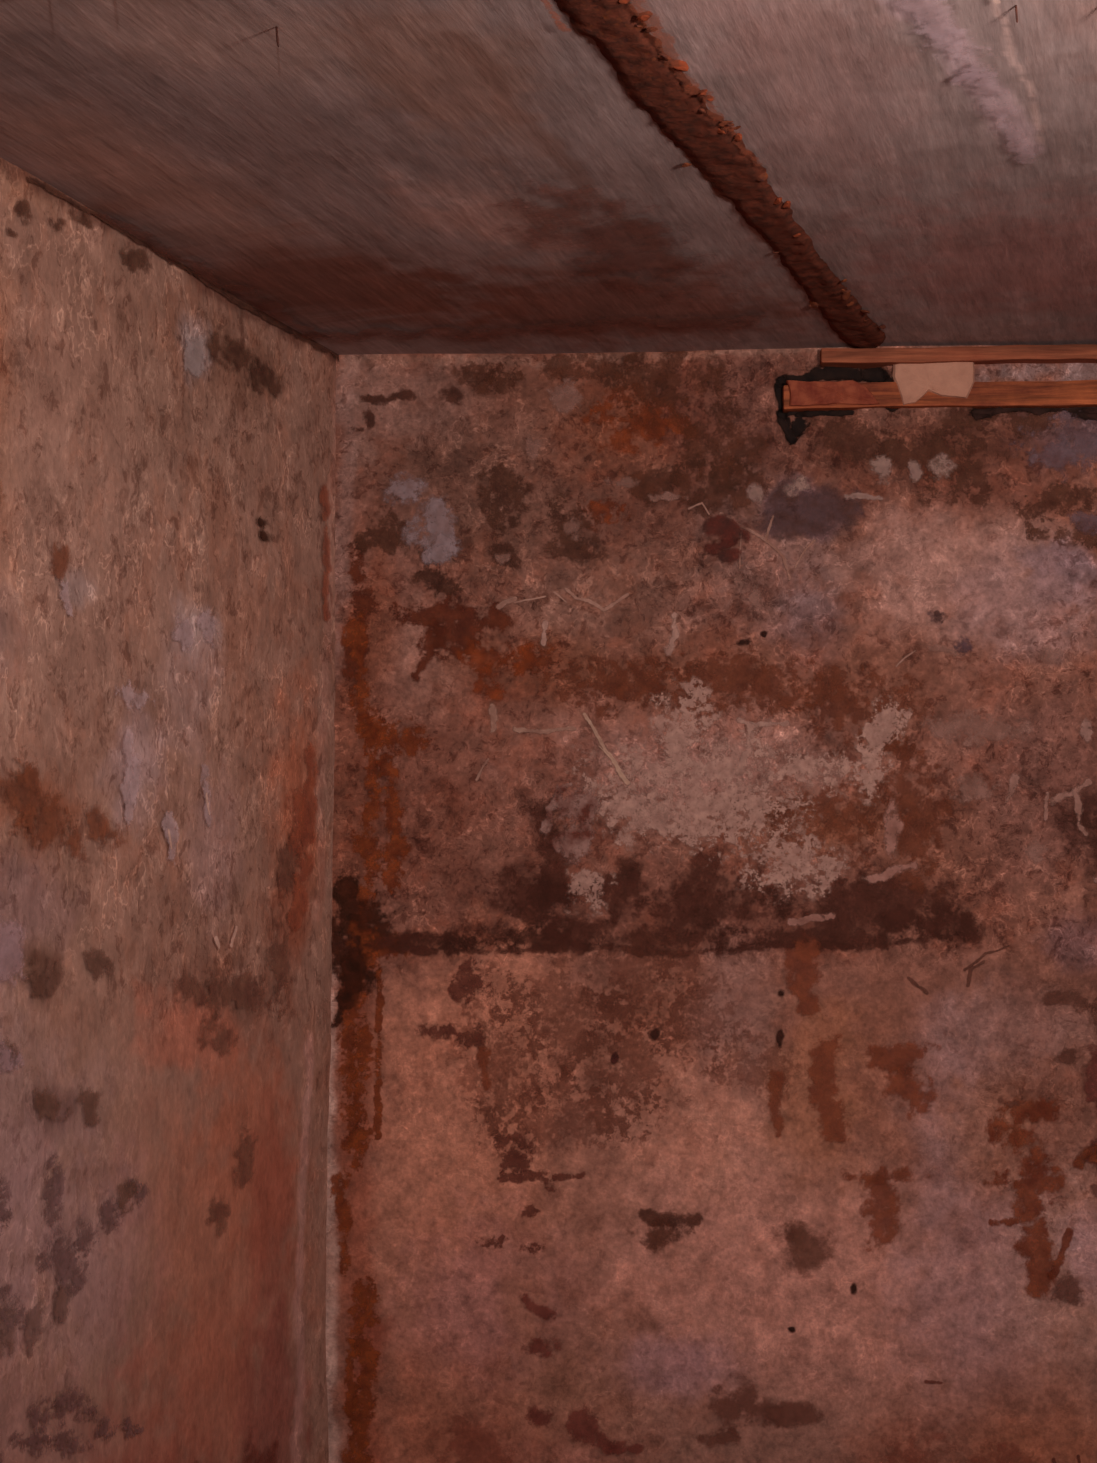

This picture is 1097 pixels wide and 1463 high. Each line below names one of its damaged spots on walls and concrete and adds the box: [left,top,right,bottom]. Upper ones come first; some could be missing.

corrosion [618,0,768,182]
corrosion [536,641,952,894]
leakage [370,678,1032,1004]
leakage [1044,778,1097,857]
corrosion [320,485,514,1463]
leakage [420,1022,486,1049]
leakage [33,1086,101,1127]
corrosion [808,1035,848,1142]
corrosion [867,1041,936,1118]
leakage [492,1130,585,1192]
leakage [476,1234,545,1254]
corrosion [845,1166,911,1250]